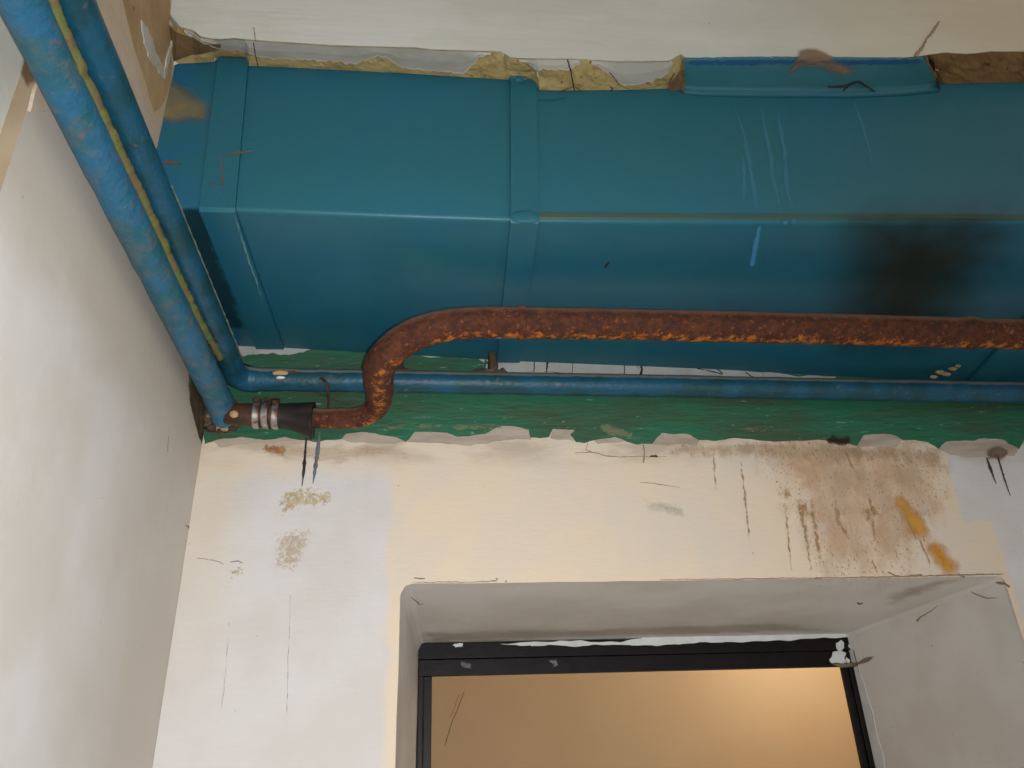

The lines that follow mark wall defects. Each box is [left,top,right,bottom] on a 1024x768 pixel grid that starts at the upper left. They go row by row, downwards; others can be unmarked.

flaking render [96,0,685,149]
flaking render [926,52,1024,84]
peeling [238,346,311,356]
flaking render [188,374,298,448]
rust [263,444,285,455]
peeling [342,426,531,446]
peeling [653,433,699,446]
peeling [858,434,902,448]
peeling [941,438,1019,457]
leakage [280,489,329,511]
leakage [765,436,944,574]
rust [896,499,954,572]